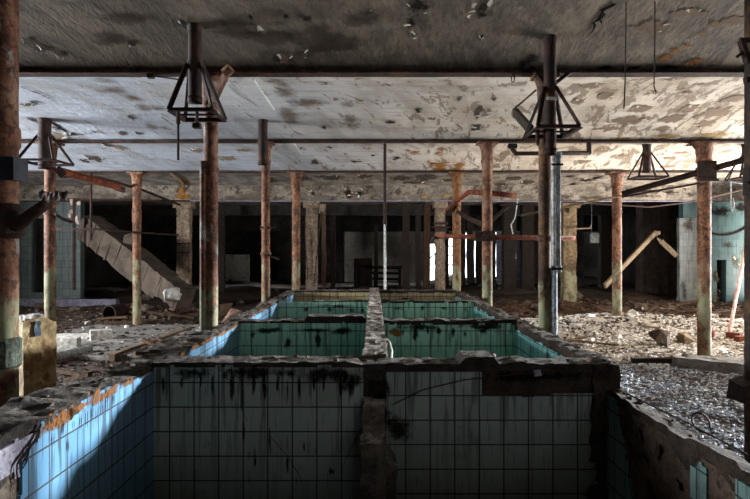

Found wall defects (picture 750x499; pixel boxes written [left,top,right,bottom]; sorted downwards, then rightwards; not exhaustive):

spalling [403,0,429,39]
spalling [467,0,493,19]
peeling [580,83,617,100]
spalling [471,106,493,131]
peeling [592,95,744,133]
rust [427,148,465,171]
peeling [577,148,628,164]
leakage [397,324,441,341]
leakage [451,323,501,337]
leakage [223,365,362,409]
rust [40,378,133,436]
spalling [619,406,690,499]